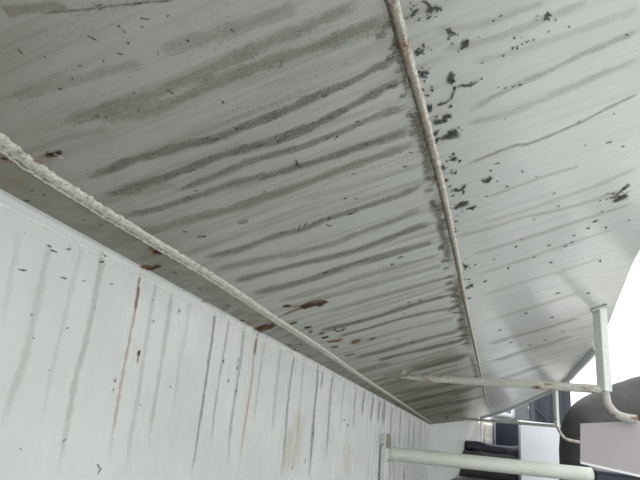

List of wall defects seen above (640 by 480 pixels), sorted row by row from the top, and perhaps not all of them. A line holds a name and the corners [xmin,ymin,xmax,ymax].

corrosion [283,300,328,315]
damp [196,316,216,445]